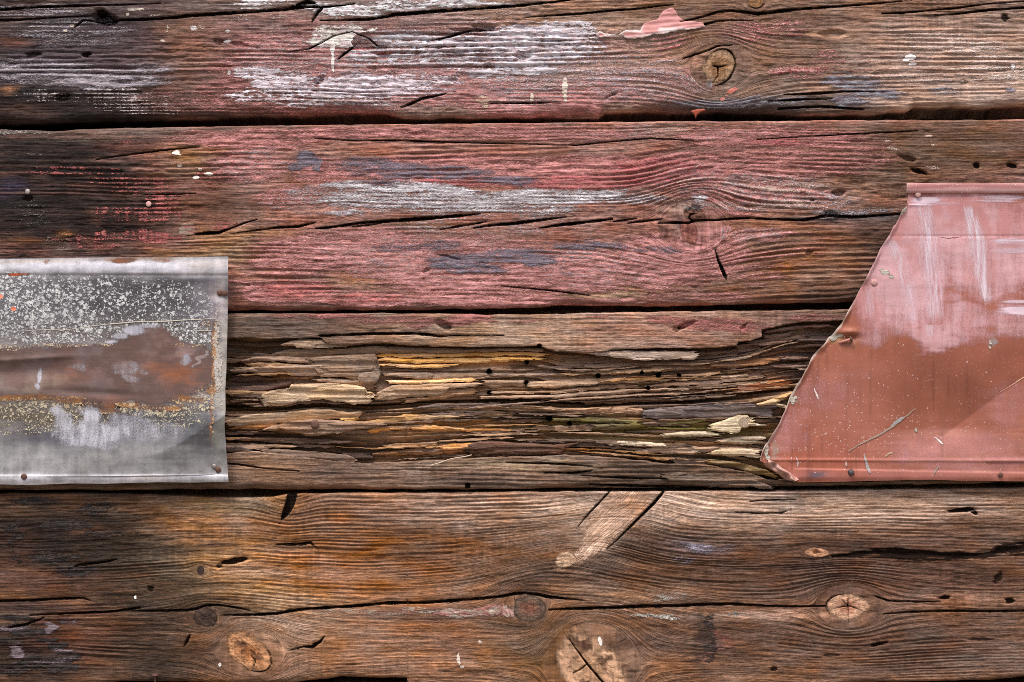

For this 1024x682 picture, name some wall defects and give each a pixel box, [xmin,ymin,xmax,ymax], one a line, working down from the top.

crack [0,0,1024,86]
peeling [26,163,190,250]
peeling [119,0,940,333]
crack [195,212,900,235]
rust [0,258,227,437]
crack [507,462,712,547]
crack [0,592,1024,682]